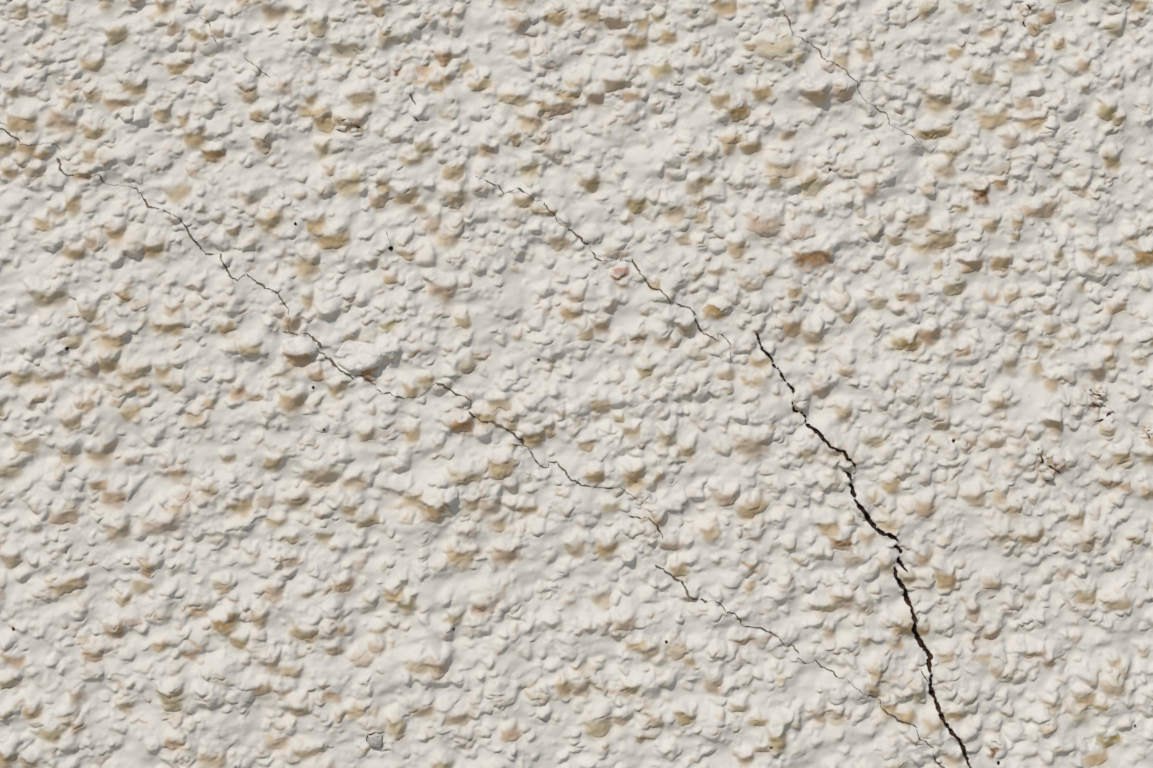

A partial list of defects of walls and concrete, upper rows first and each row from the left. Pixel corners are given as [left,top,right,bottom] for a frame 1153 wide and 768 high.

crack [780,0,917,141]
crack [0,122,663,538]
crack [476,176,972,768]